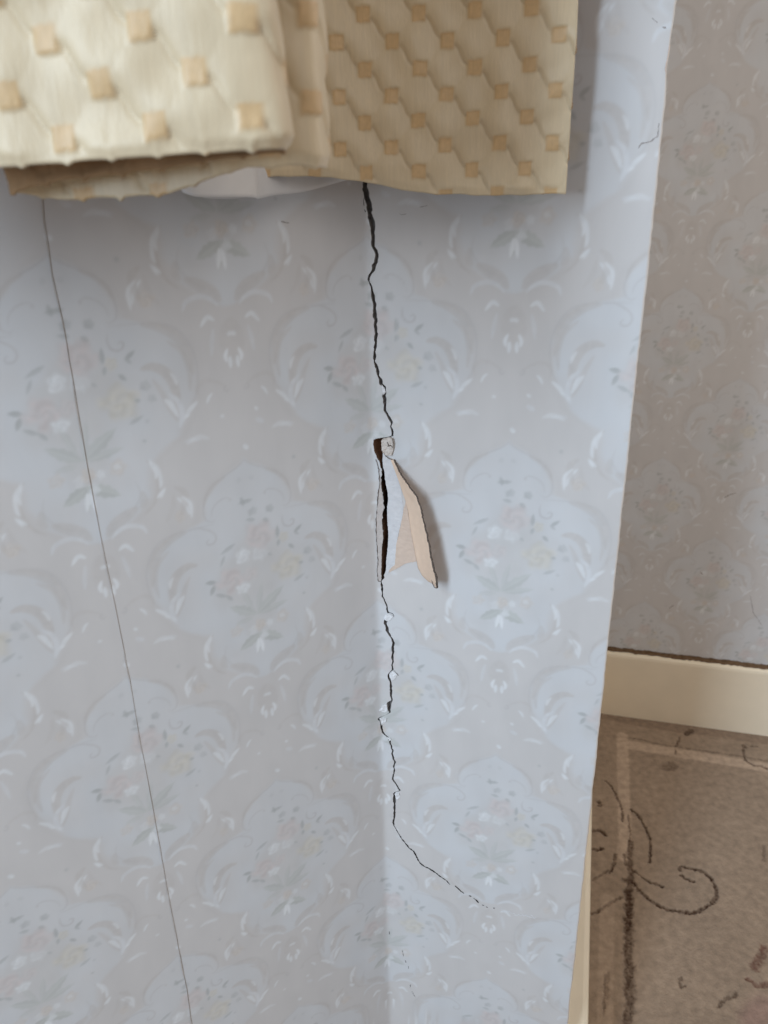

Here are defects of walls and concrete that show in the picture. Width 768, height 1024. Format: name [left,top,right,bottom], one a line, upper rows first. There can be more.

crack [362,182,536,918]